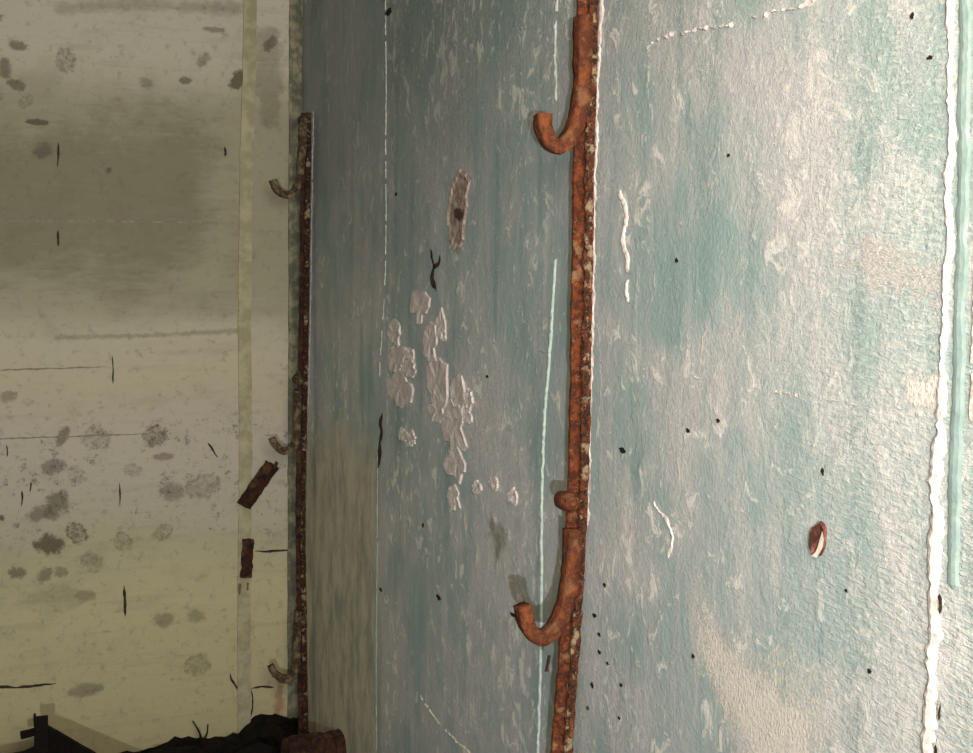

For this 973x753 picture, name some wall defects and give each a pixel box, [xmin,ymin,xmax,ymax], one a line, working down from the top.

damp [228,70,243,89]
spalling [447,167,471,253]
peeling [385,291,518,511]
damp [32,523,87,556]
crack [936,593,944,614]